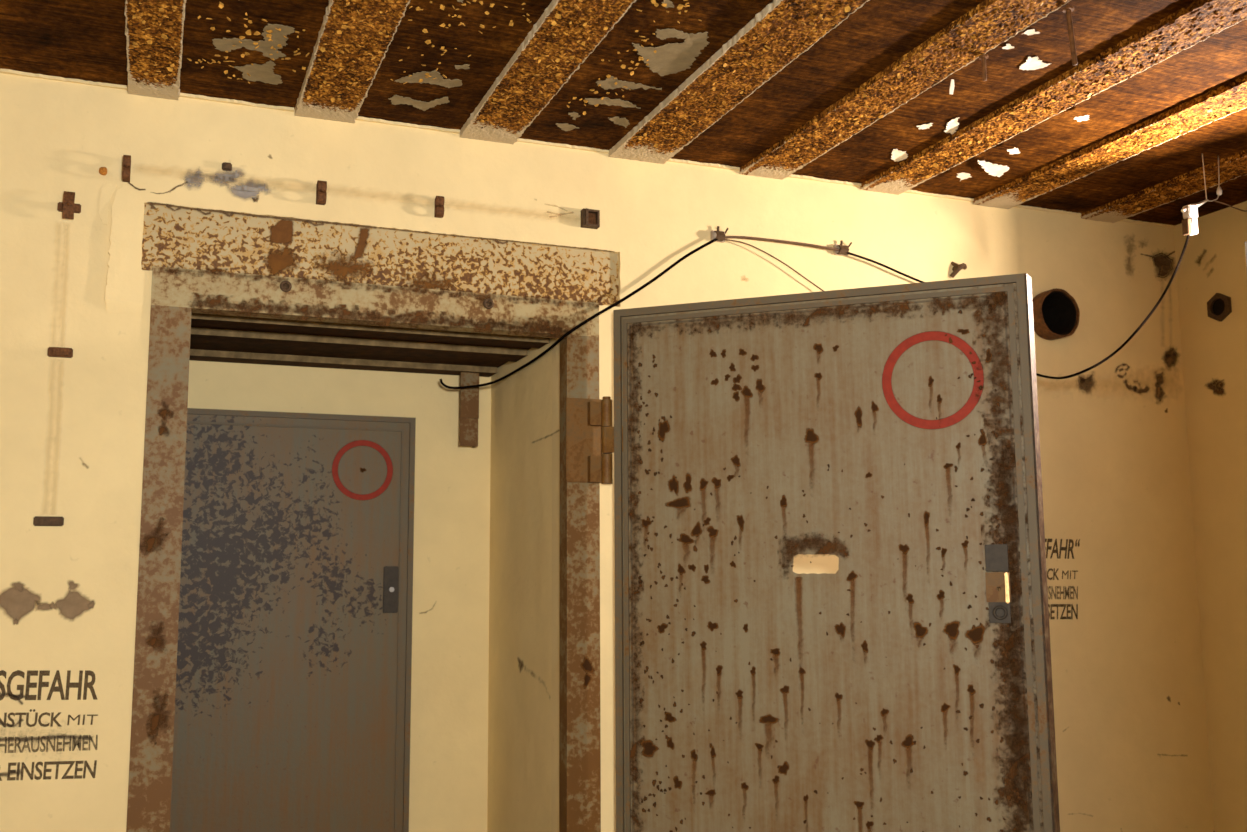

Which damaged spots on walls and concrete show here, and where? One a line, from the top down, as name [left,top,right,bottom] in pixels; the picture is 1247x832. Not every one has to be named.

peeling [388,64,470,111]
peeling [556,28,710,131]
peeling [1019,56,1050,70]
peeling [916,117,960,134]
peeling [890,149,908,162]
peeling [957,147,1020,181]
rust [165,219,599,339]
rust [158,406,173,435]
rust [140,518,168,554]
rust [627,322,741,832]
rust [675,289,1043,832]
rust [148,694,168,745]